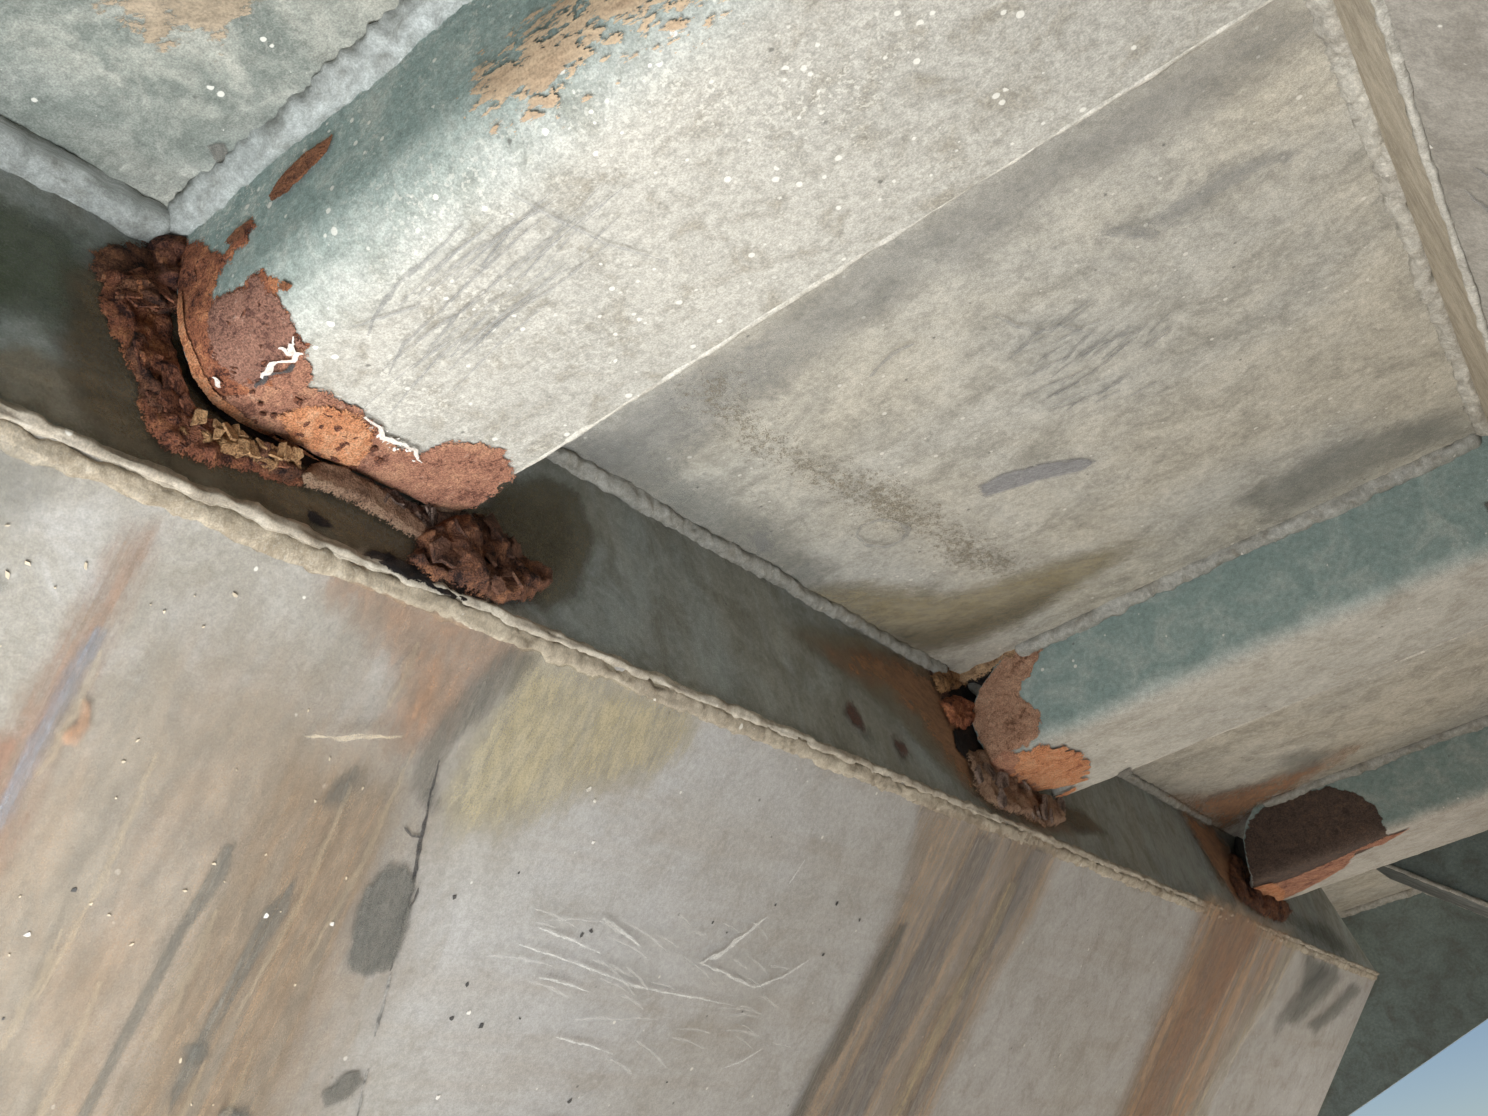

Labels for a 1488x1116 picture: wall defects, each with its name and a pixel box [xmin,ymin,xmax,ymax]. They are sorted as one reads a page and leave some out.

peeling [93,0,252,53]
peeling [456,0,744,135]
corrosion [269,134,333,201]
corrosion [87,217,516,539]
leakage [678,359,1111,647]
leakage [419,651,688,822]
corrosion [807,633,1091,832]
leakage [0,679,415,1116]
corrosion [1167,749,1408,913]